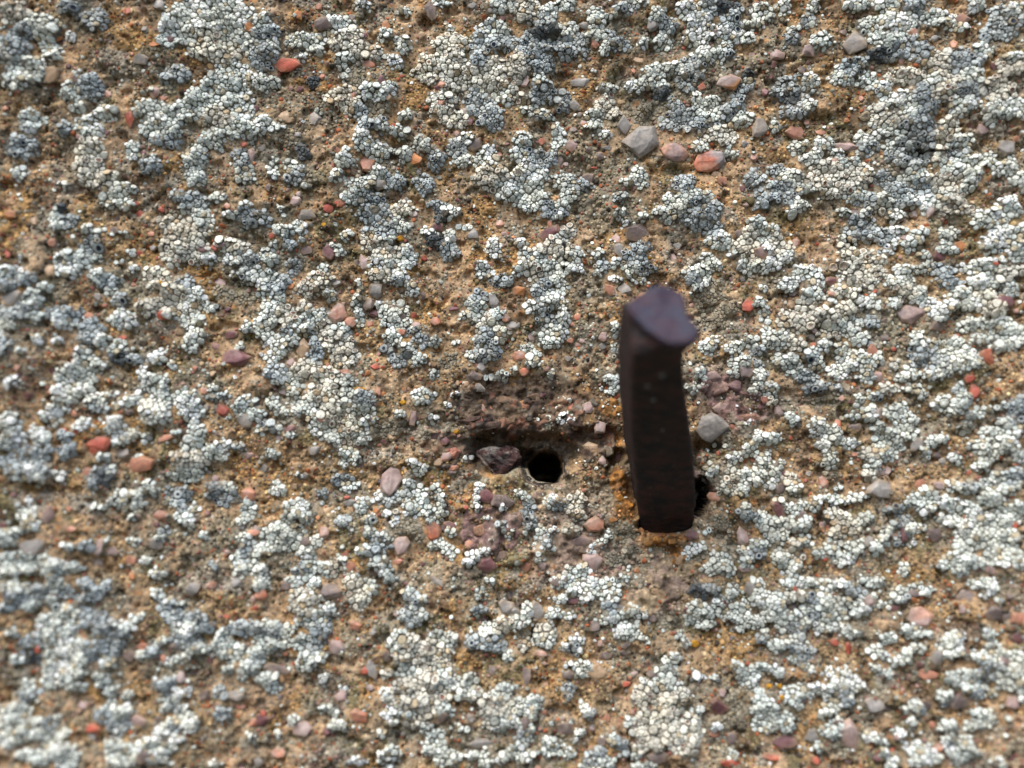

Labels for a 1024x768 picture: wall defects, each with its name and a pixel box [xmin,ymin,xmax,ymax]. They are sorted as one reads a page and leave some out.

spalling [423,374,616,471]